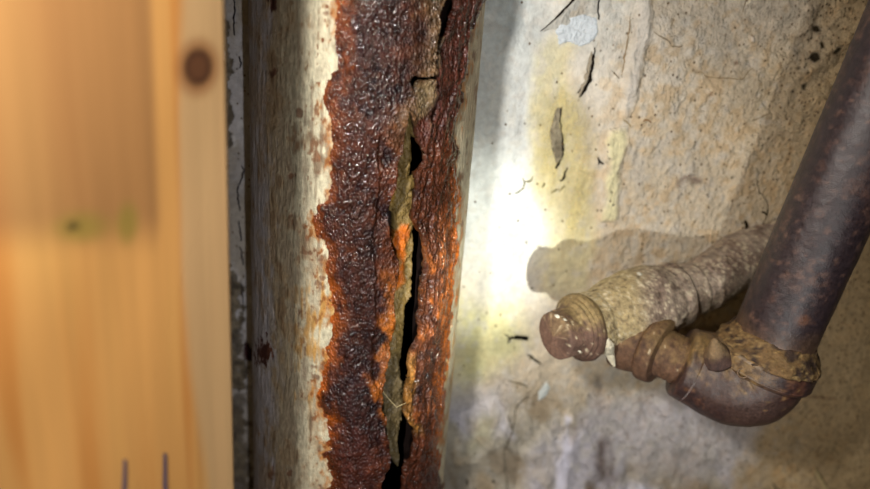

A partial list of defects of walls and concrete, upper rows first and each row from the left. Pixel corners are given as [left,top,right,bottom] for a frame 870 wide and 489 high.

peeling [550,108,562,163]